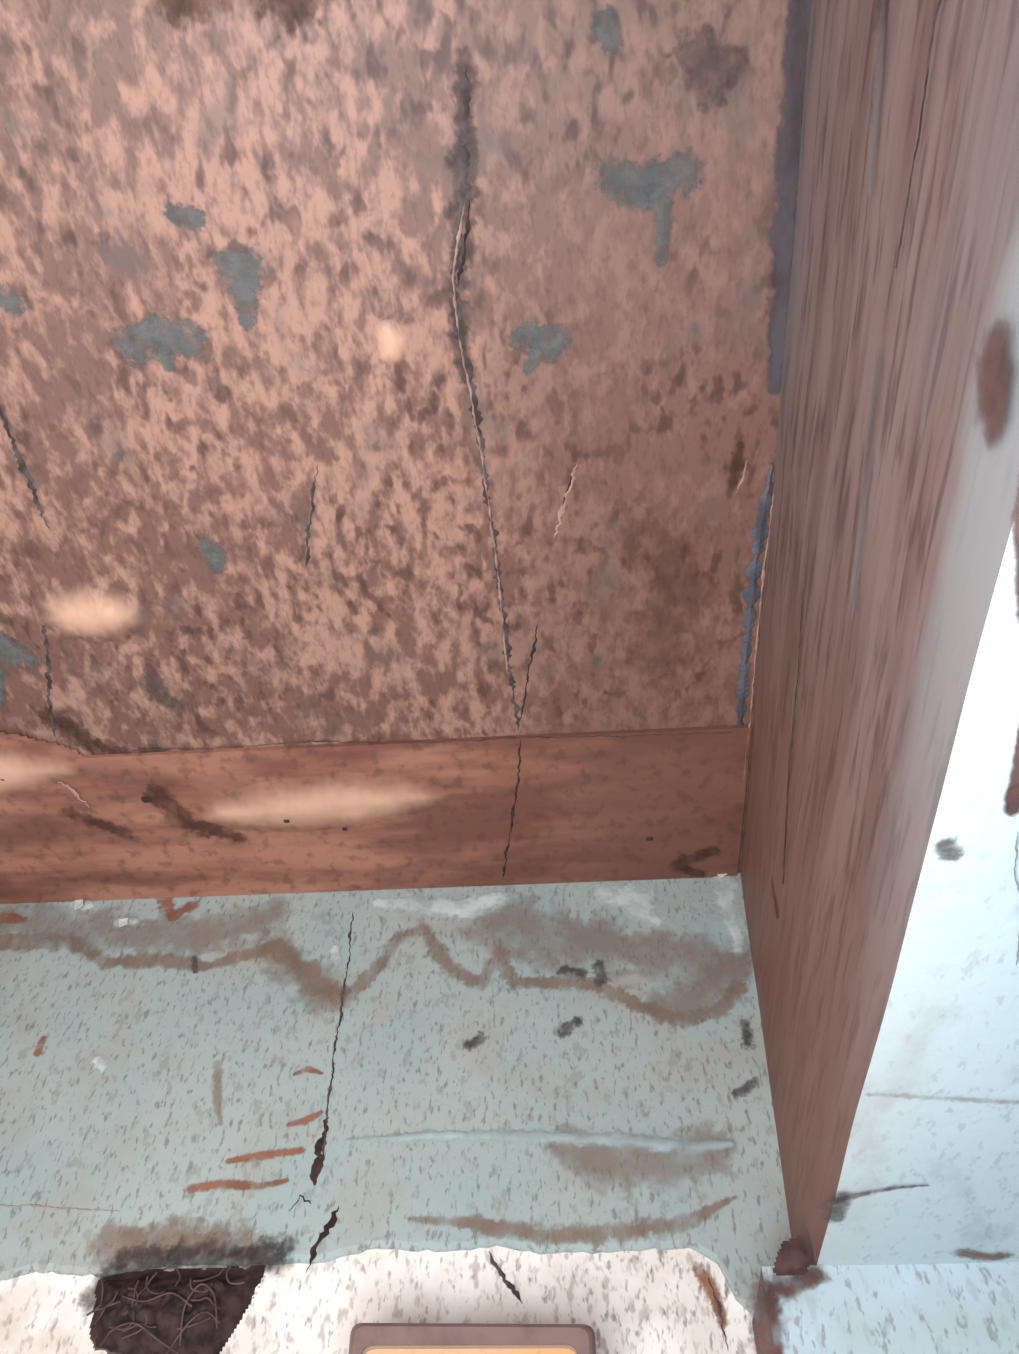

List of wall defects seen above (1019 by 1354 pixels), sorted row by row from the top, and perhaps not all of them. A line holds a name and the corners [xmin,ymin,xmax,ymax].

peeling [600,152,702,266]
peeling [213,248,266,331]
peeling [112,314,206,372]
crack [0,408,49,528]
crack [133,54,732,879]
rust [1004,729,1019,816]
leakage [0,908,389,1005]
leakage [427,910,748,1021]
crack [289,912,354,1272]
leakage [101,1218,251,1262]
rust [694,1267,728,1348]
rust [750,1267,825,1354]